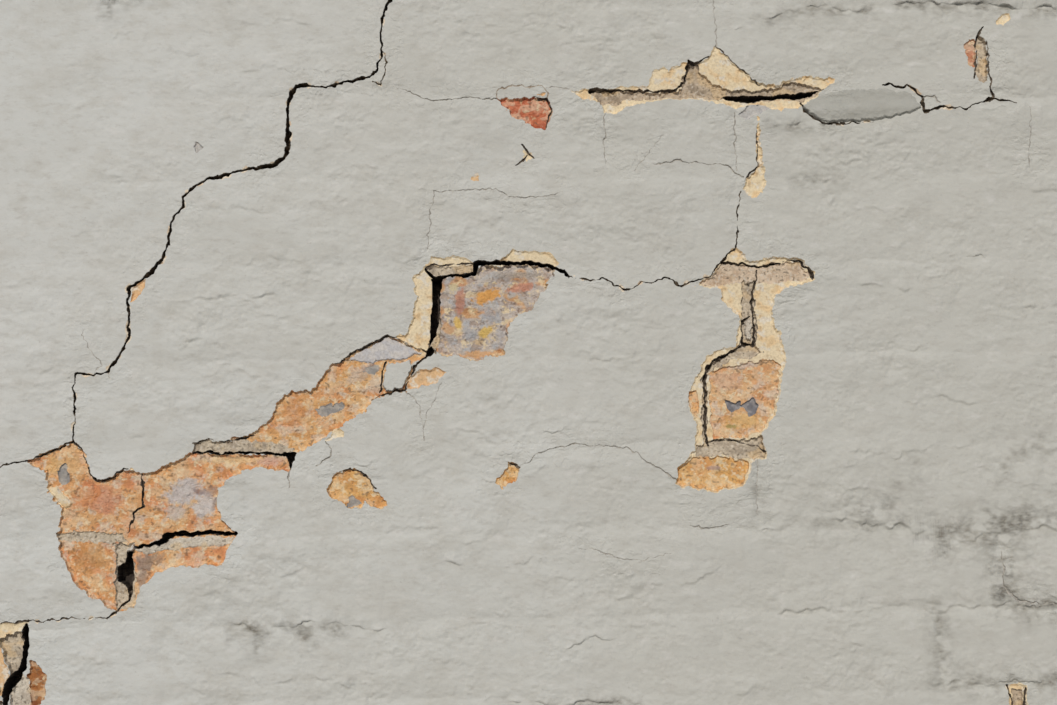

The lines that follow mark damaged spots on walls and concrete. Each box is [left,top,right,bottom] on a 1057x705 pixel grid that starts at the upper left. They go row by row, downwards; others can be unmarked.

flaking render [964,13,1011,98]
flaking render [496,84,553,130]
flaking render [571,46,835,198]
crack [799,103,871,126]
crack [882,82,1032,166]
crack [71,0,498,443]
crack [426,188,559,249]
crack [568,112,744,292]
flaking render [675,247,816,493]
flaking render [26,249,569,614]
crack [287,441,332,488]
flaking render [0,619,47,705]